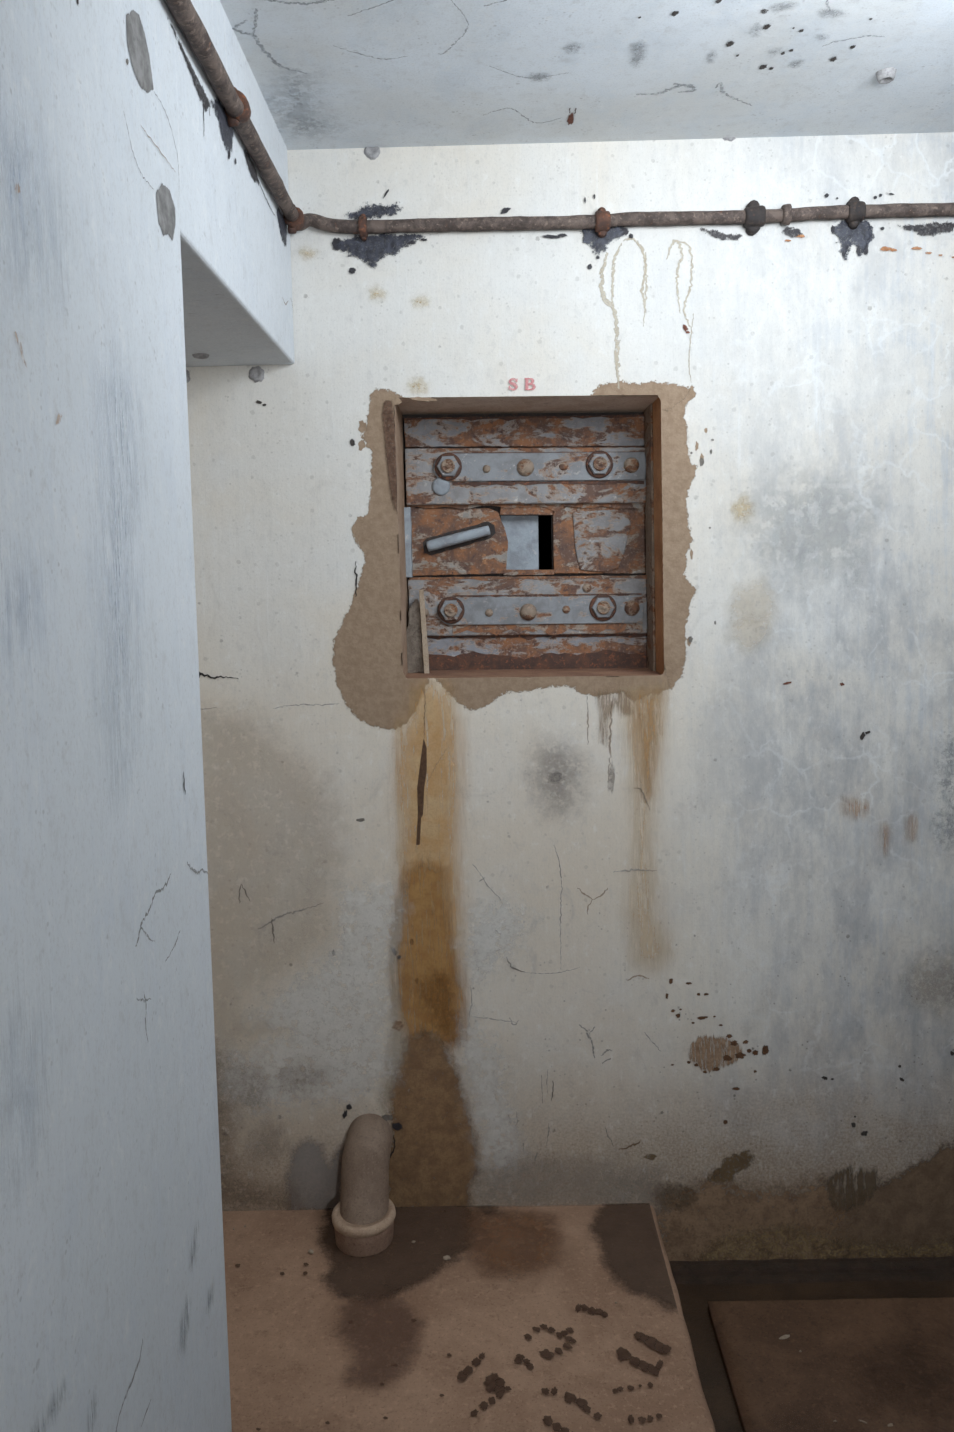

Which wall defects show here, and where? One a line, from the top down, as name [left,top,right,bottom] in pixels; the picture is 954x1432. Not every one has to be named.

crack [416,691,446,845]
corrosion [587,693,658,782]
corrosion [389,650,647,1207]
water stain [288,1143,476,1383]
water stain [591,1144,954,1309]